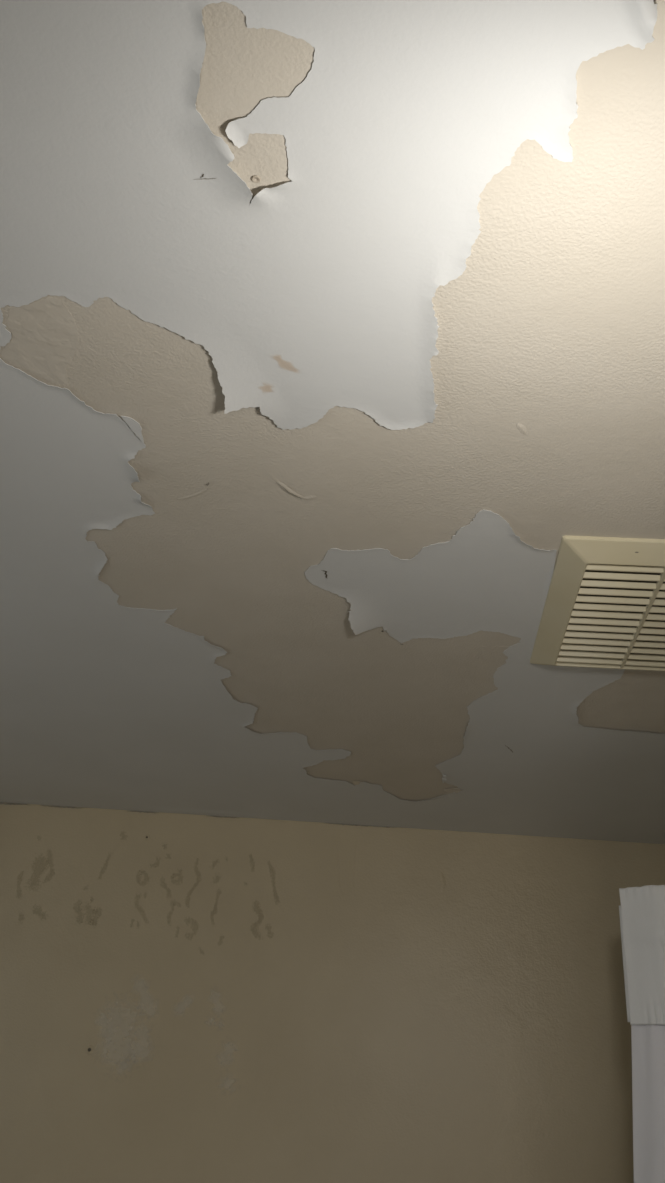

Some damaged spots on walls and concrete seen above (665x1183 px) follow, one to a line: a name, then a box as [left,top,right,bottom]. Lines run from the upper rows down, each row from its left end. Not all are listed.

peeling [0,0,665,844]